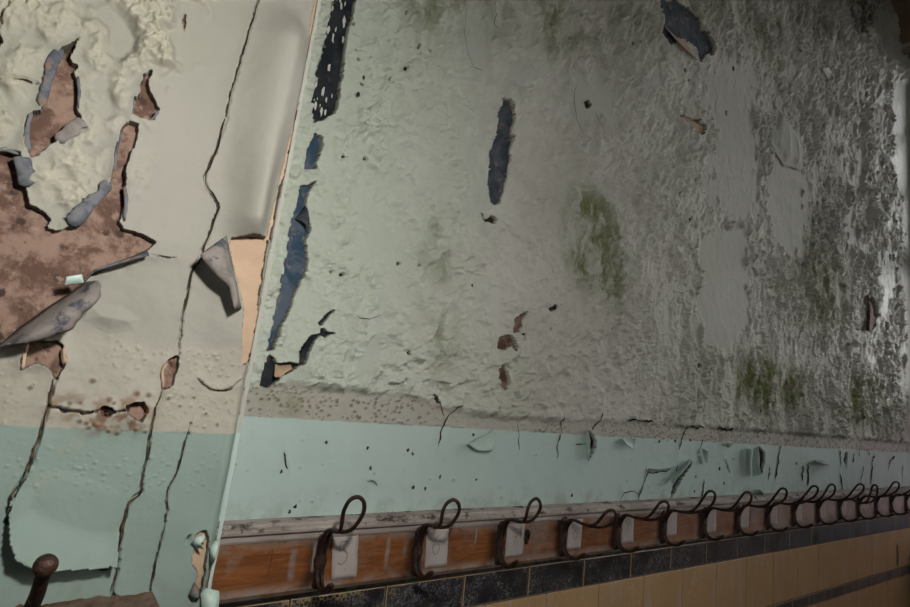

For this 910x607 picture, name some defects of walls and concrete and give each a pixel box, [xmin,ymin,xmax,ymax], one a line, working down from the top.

peeling [0,48,159,379]
crack [158,0,260,354]
peeling [200,110,297,364]
peeling [260,184,333,387]
peeling [304,136,320,169]
peeling [487,101,513,205]
mould [577,194,623,296]
crack [8,380,117,517]
crack [112,390,163,595]
crack [150,424,191,592]
mould [737,360,804,409]
mould [851,382,876,421]